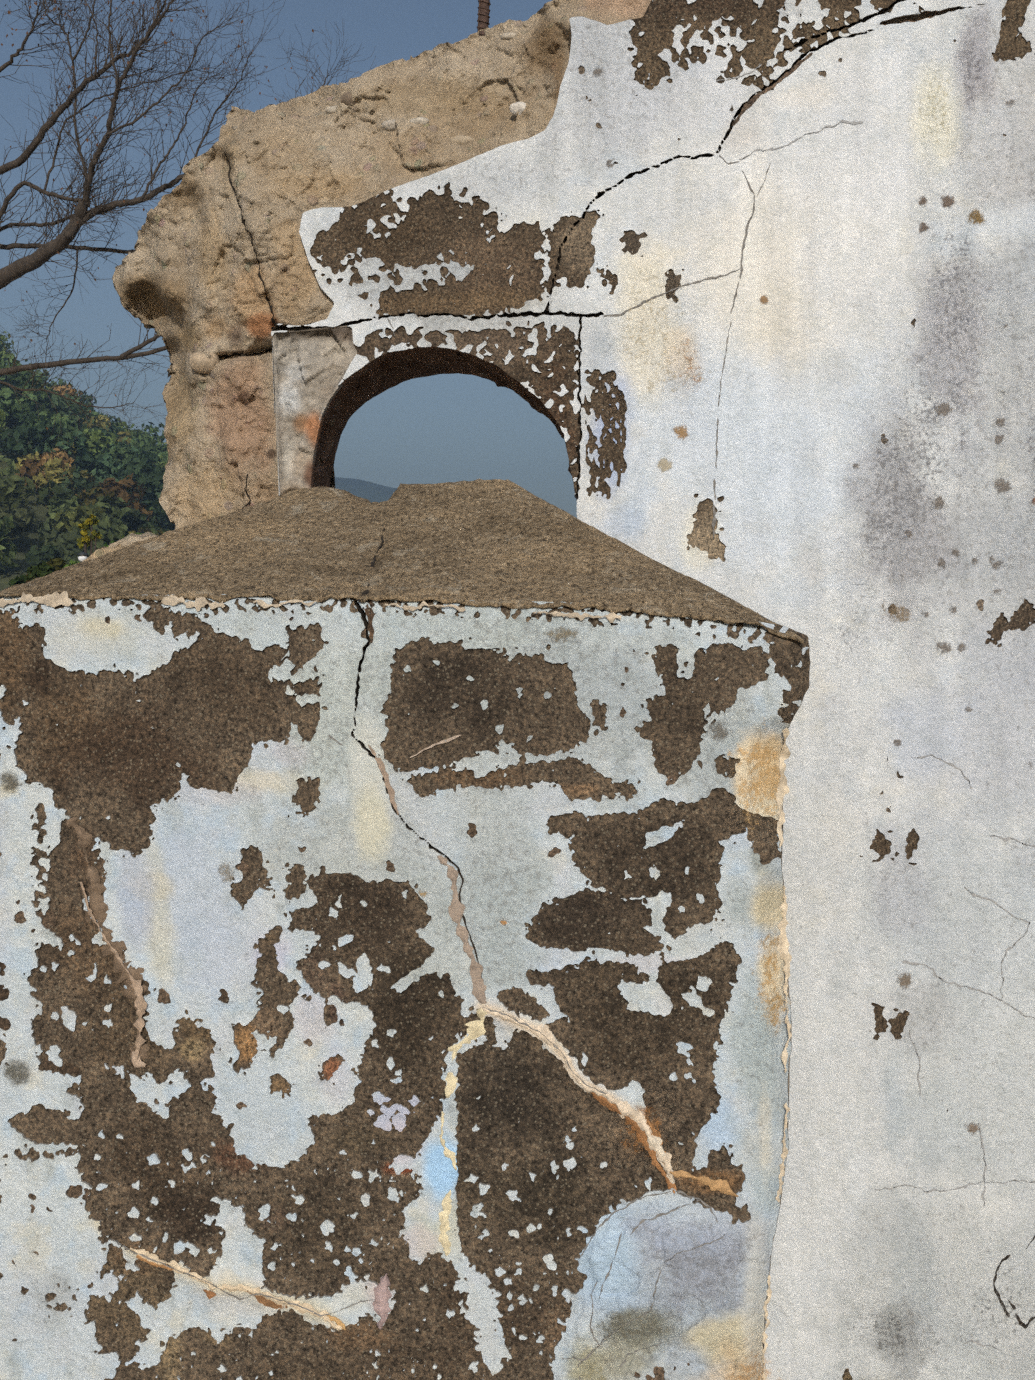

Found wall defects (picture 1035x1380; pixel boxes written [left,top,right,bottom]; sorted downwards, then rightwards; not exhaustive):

rust [477,0,491,36]
peeling [992,0,1035,62]
spalling [112,0,962,530]
crack [220,0,906,539]
spalling [82,532,158,562]
peeling [687,494,726,562]
peeling [860,828,919,865]
crack [353,528,738,1256]
peeling [0,591,810,1380]
peeling [870,1002,909,1040]
crack [111,1239,373,1331]